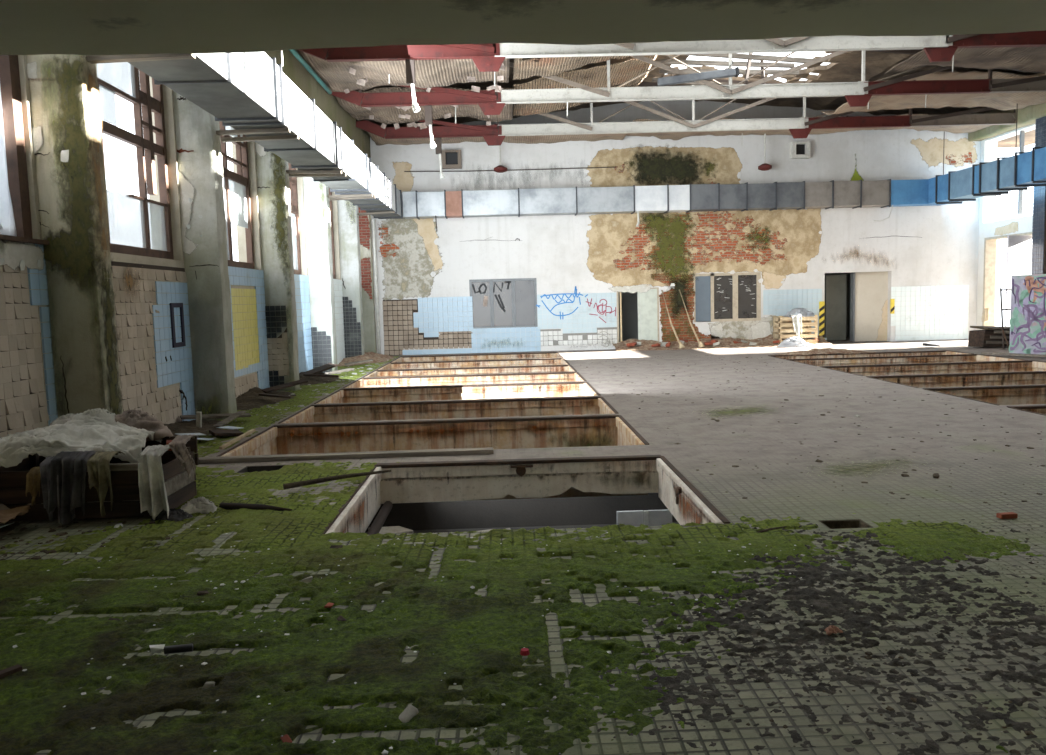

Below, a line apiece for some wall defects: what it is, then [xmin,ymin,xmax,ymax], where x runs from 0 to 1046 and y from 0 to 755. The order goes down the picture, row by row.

flaking render [910,137,978,172]
flaking render [0,240,44,270]
flaking render [358,207,448,301]
flaking render [584,209,823,342]
rust [390,387,523,447]